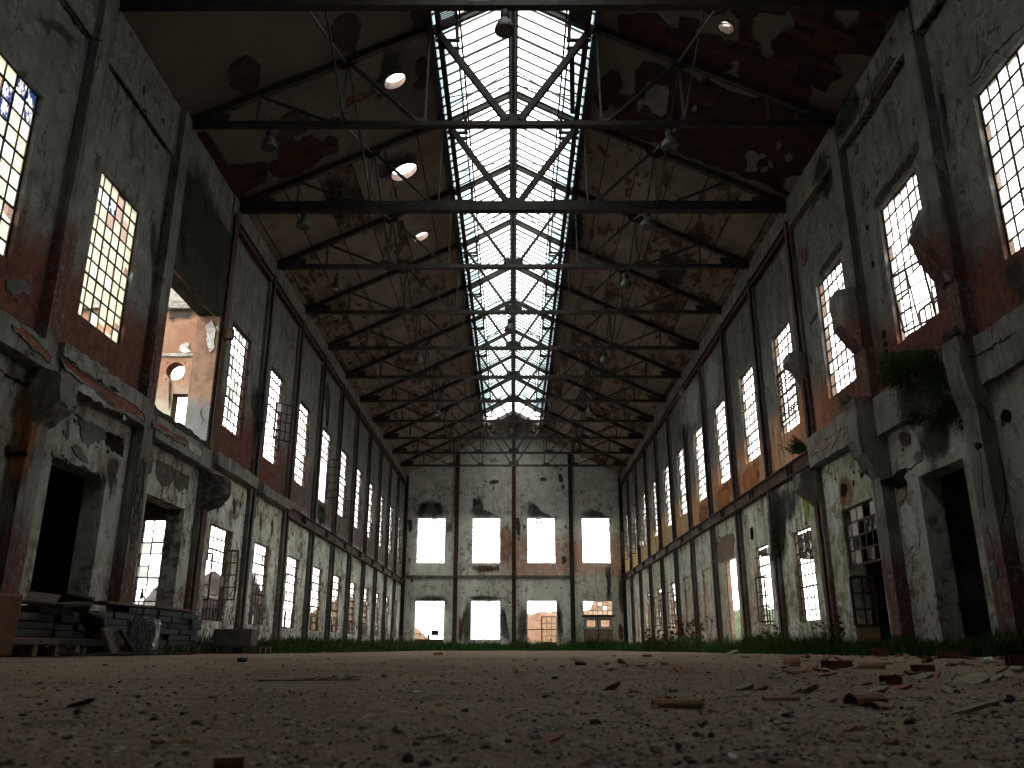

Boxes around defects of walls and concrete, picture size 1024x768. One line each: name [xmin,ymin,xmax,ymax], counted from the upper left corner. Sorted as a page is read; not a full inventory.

spalling [593,11,899,196]
spalling [196,131,339,195]
spalling [11,324,201,457]
peeling [51,418,124,481]
water stain [527,504,550,517]
water stain [584,509,609,518]
water stain [776,489,803,538]
spalling [709,533,734,563]